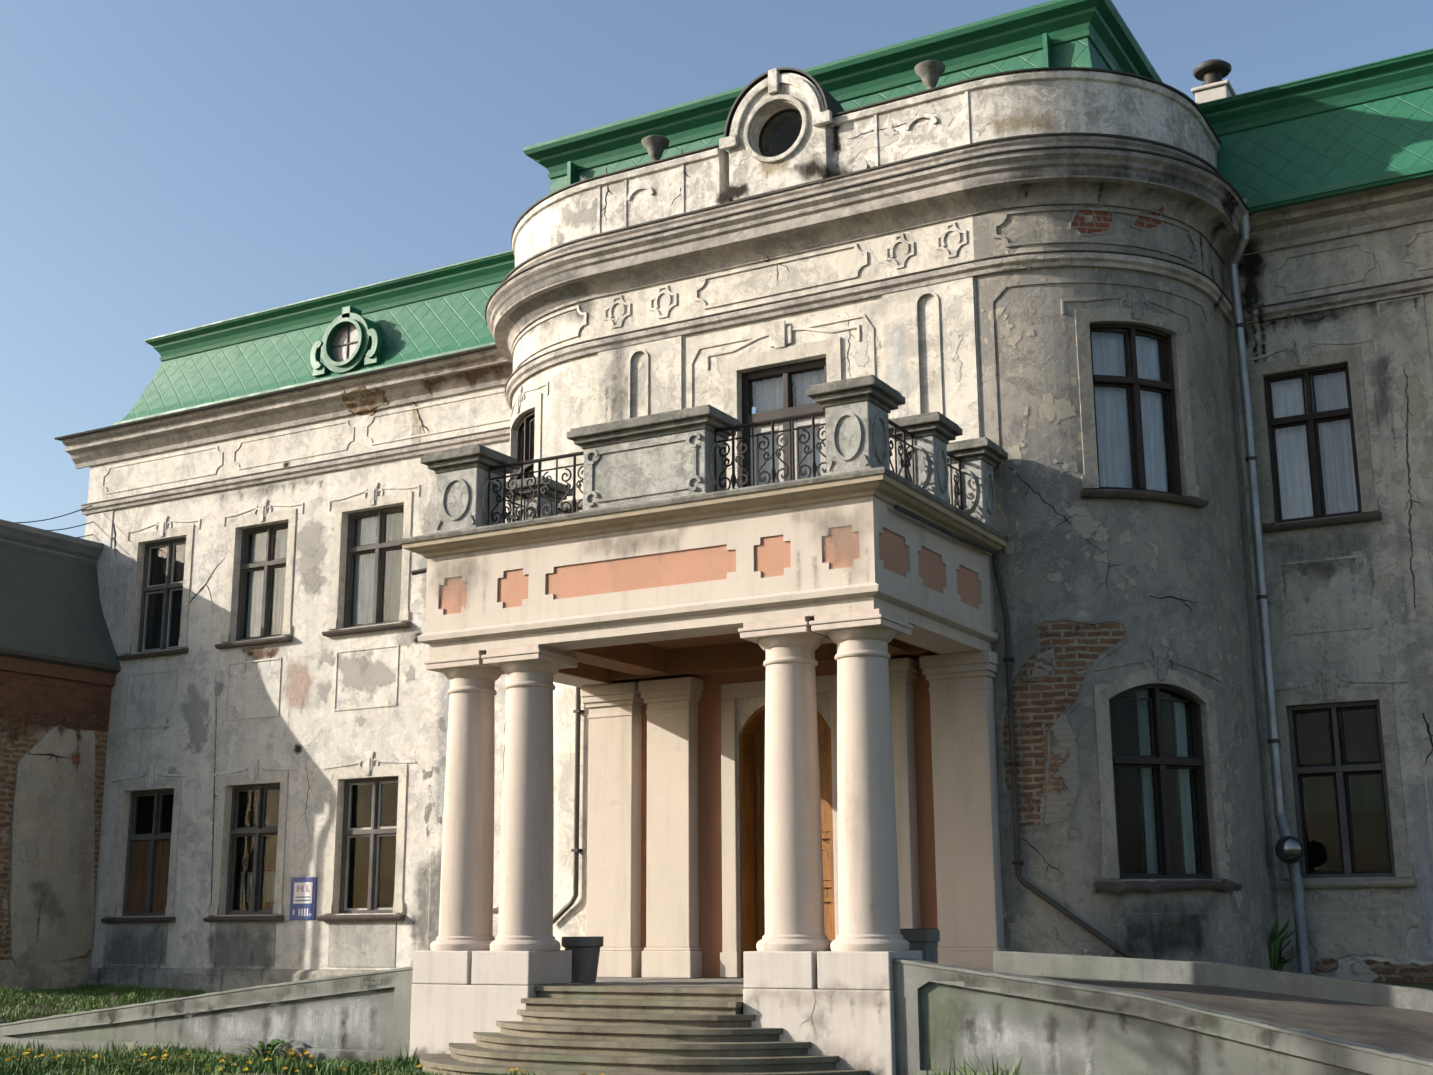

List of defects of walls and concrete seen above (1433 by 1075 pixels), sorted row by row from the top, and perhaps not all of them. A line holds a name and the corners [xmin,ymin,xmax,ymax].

flaking render [1067,202,1166,237]
peeling [1001,244,1072,285]
spalling [340,386,390,416]
crack [1403,368,1425,607]
crack [1009,468,1123,596]
crack [189,558,225,606]
crack [1150,595,1204,616]
flaking render [996,612,1131,833]
crack [1422,713,1433,761]
flaking render [1312,956,1433,983]